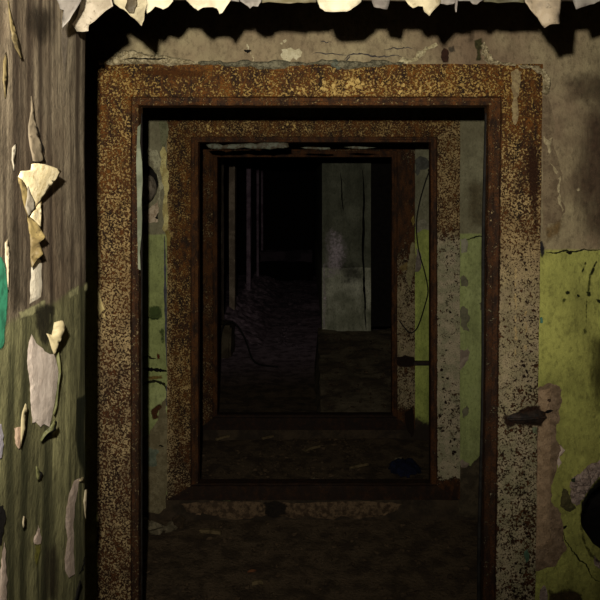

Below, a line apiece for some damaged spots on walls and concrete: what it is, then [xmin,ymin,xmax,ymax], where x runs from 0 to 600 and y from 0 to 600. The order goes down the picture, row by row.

peeling [57,0,173,32]
peeling [186,0,361,14]
peeling [372,0,390,10]
peeling [405,0,561,28]
peeling [573,0,600,9]
peeling [12,96,61,303]
corrosion [527,144,539,227]
leakage [540,223,560,256]
crack [546,248,600,256]
corrosion [396,355,415,377]
peeling [14,320,66,448]
flaking render [524,383,600,571]